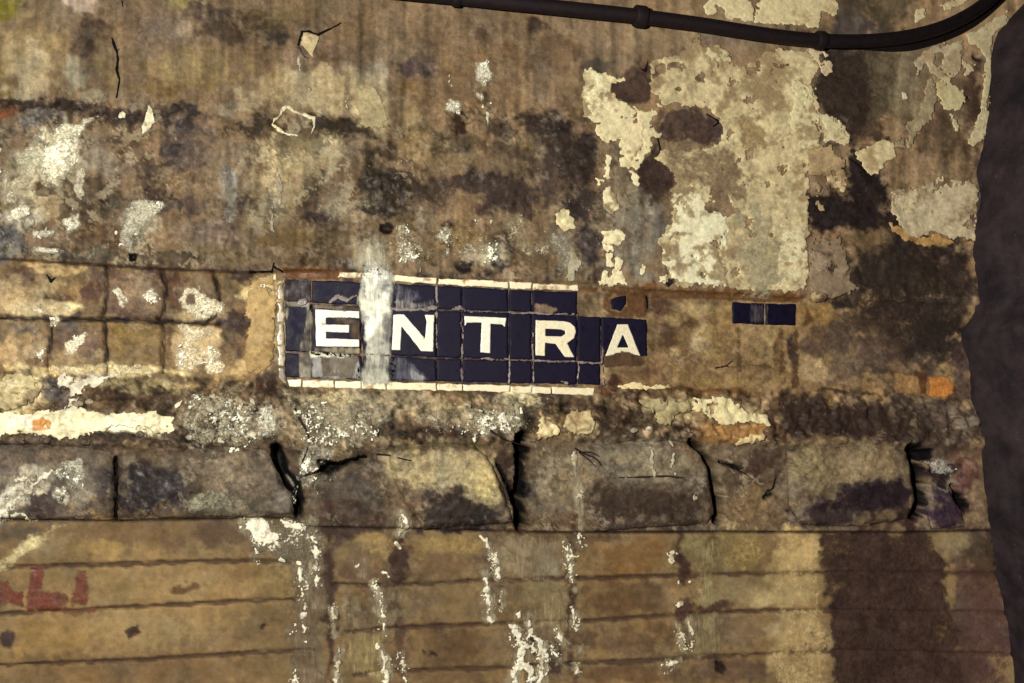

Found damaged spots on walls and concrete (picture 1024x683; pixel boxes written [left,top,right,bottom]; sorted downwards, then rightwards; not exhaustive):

crack [111,37,120,98]
crack [297,22,342,58]
peeling [940,0,968,11]
peeling [581,8,1009,303]
peeling [0,372,175,441]
peeling [617,382,771,446]
crack [317,456,367,471]
leakage [246,391,410,683]
leakage [419,531,588,683]
leakage [661,532,1006,683]